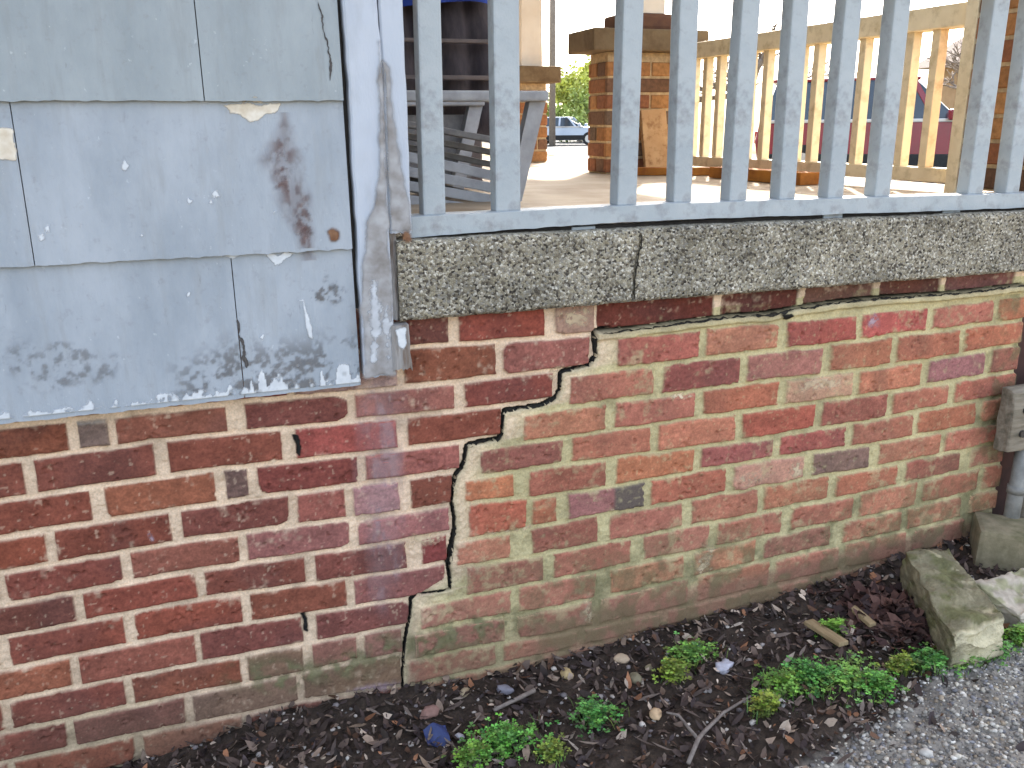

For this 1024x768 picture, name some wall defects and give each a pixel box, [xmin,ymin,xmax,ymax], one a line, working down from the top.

crack [318,3,332,78]
peeling [0,128,17,161]
rust [277,142,306,200]
peeling [111,61,411,408]
rust [297,223,310,248]
rust [328,229,339,241]
crack [633,235,642,299]
crack [236,320,249,368]
peeling [24,401,94,417]
crack [401,285,1024,687]